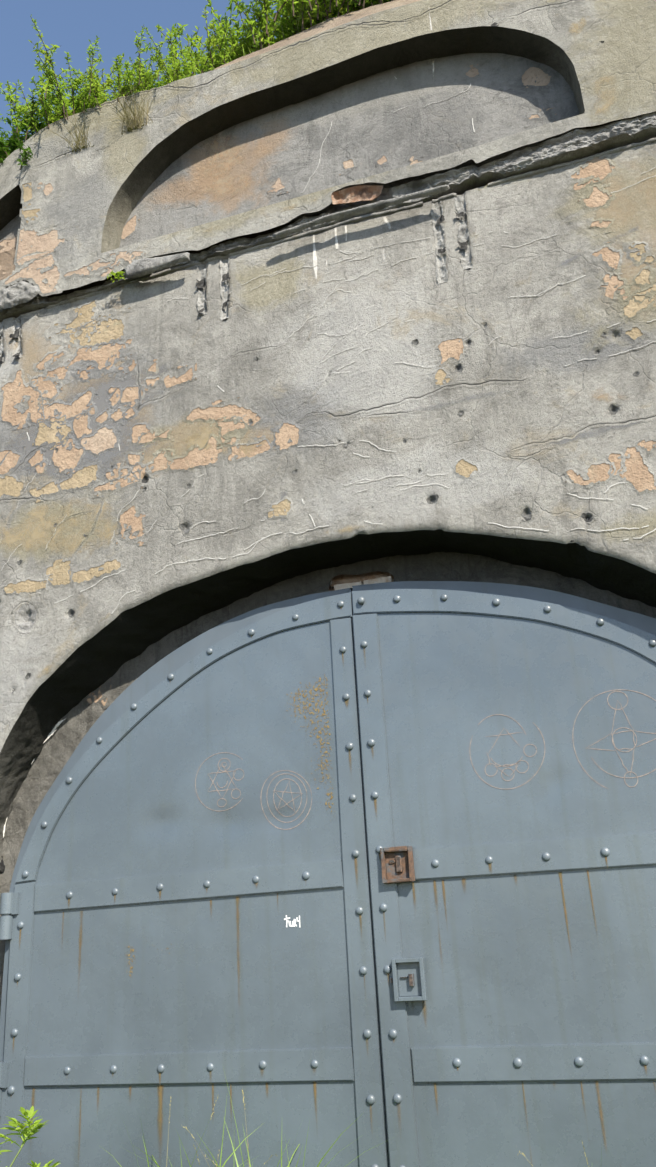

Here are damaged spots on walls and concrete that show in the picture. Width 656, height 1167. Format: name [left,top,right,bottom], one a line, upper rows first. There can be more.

crack [80,0,457,114]
crack [497,0,582,25]
flaking render [518,64,564,128]
spalling [0,112,656,630]
crack [216,237,536,493]
crack [508,275,586,299]
crack [552,319,656,367]
crack [504,413,656,476]
crack [0,432,158,572]
crack [0,489,329,636]
crack [488,482,656,542]
corrosion [286,677,335,817]